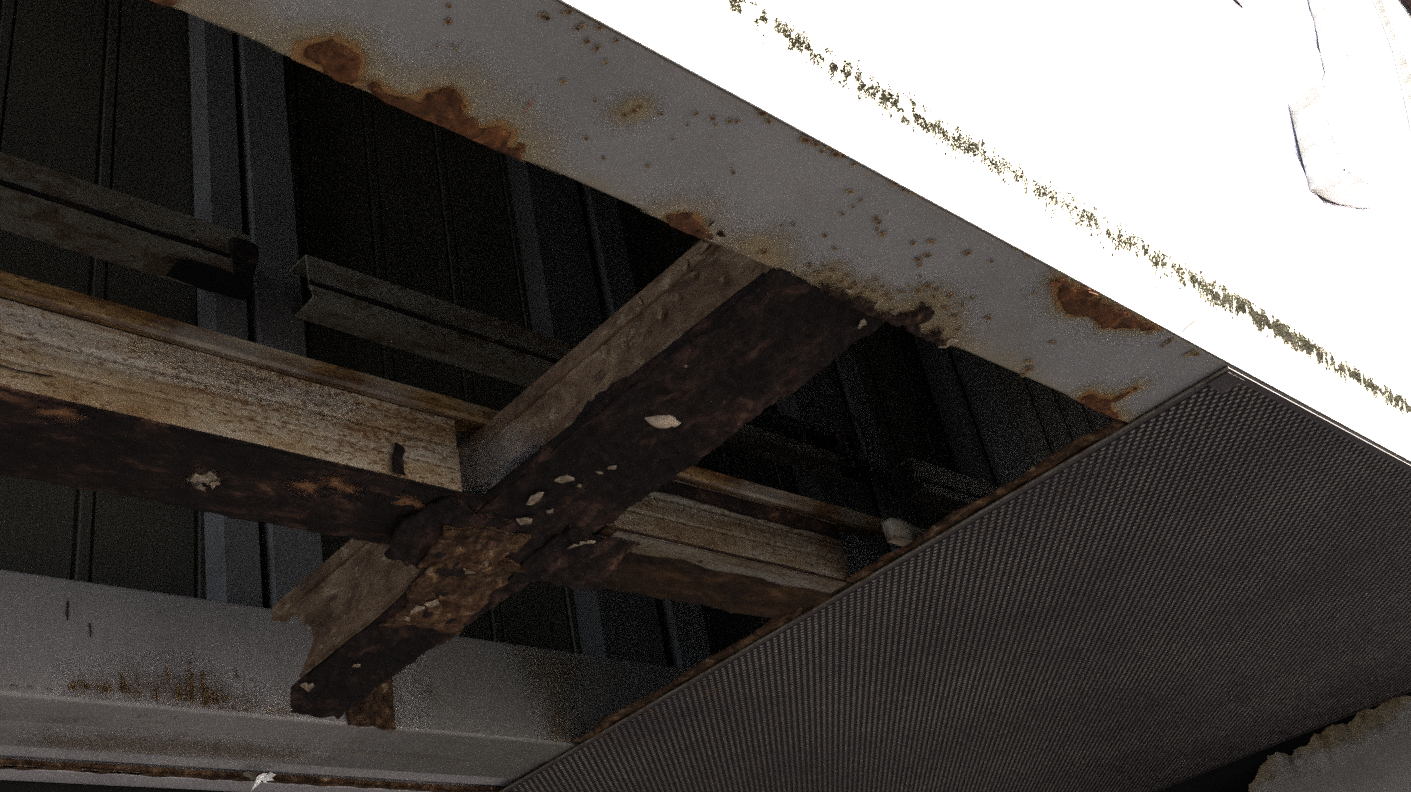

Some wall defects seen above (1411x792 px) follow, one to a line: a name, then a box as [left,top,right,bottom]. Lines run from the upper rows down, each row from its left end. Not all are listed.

corrosion [149,0,209,20]
corrosion [281,29,537,163]
corrosion [650,201,726,243]
corrosion [741,223,796,266]
water stain [811,265,961,347]
corrosion [1031,273,1175,348]
corrosion [1072,382,1146,422]
corrosion [68,659,248,712]